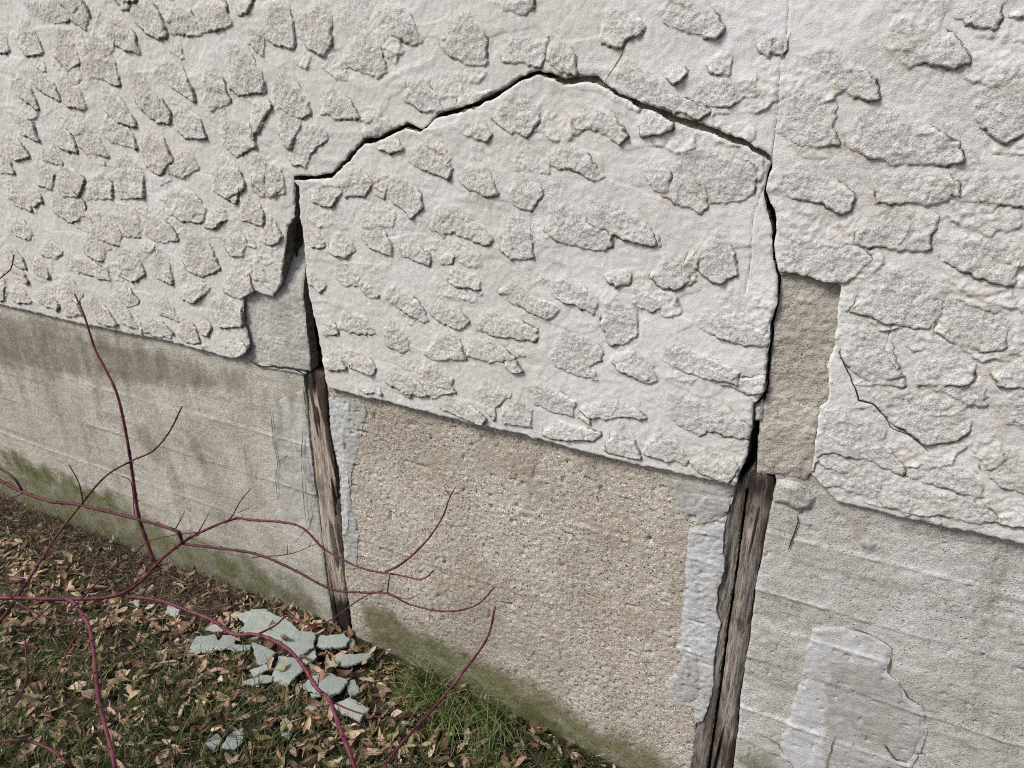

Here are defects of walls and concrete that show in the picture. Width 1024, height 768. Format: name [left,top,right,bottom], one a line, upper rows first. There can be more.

crack [295,219,304,258]
crack [305,172,336,180]
crack [371,125,419,143]
crack [445,6,789,290]
spalling [246,240,318,375]
crack [250,356,324,374]
crack [744,311,777,464]
spalling [755,274,841,510]
crack [841,357,929,452]
peeling [328,394,367,569]
peeling [665,479,736,724]